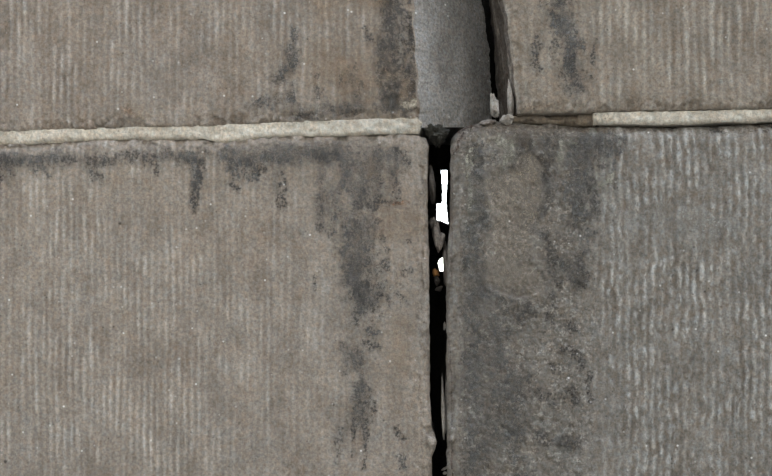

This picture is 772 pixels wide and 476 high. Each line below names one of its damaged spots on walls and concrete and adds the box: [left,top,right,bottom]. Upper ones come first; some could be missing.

water stain [275,28,362,121]
water stain [362,0,416,117]
water stain [531,35,543,72]
water stain [548,0,597,90]
water stain [0,151,159,183]
water stain [166,151,205,211]
water stain [352,144,411,212]
water stain [221,145,388,325]
water stain [461,124,651,476]
water stain [334,380,377,470]